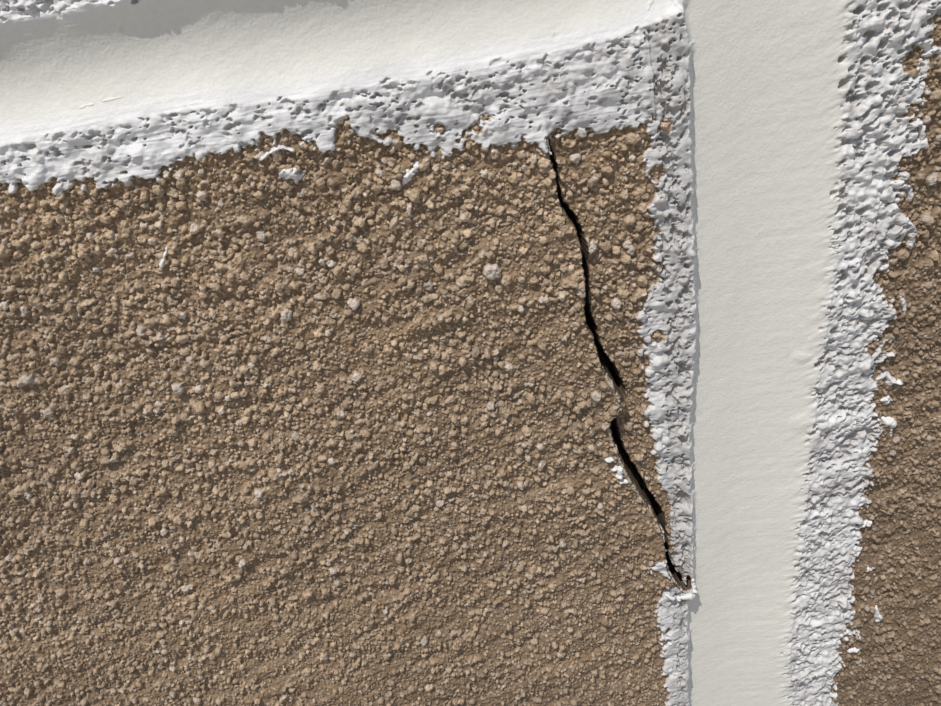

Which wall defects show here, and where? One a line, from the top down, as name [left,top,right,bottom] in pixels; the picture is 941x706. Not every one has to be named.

crack [546,137,692,594]